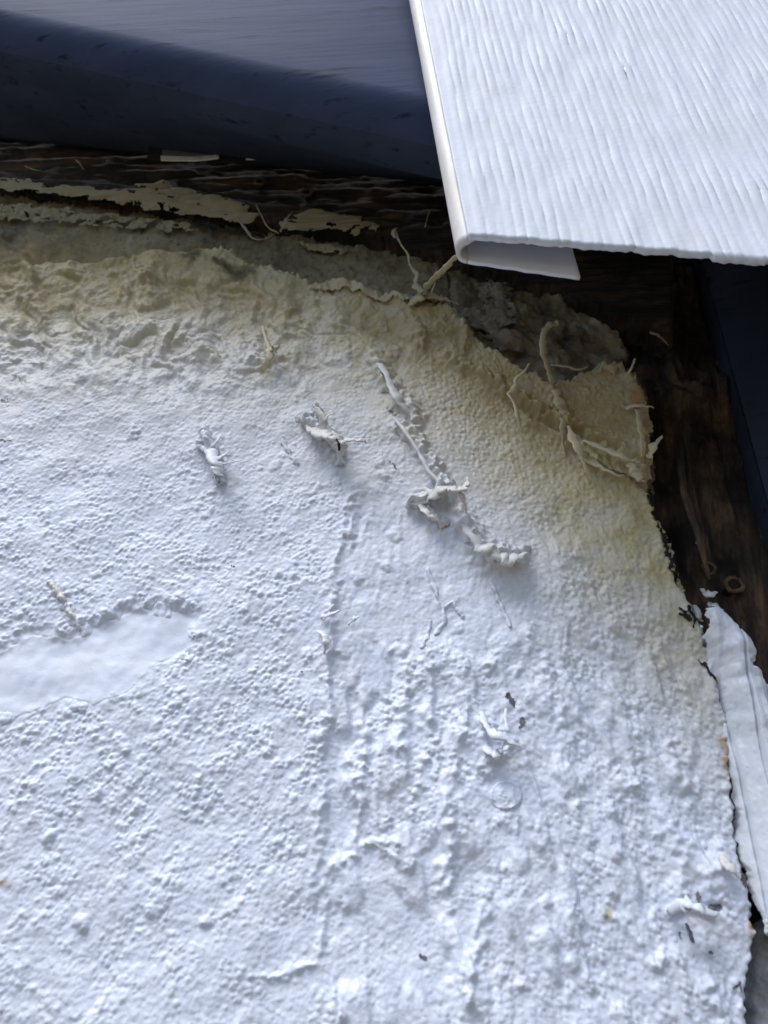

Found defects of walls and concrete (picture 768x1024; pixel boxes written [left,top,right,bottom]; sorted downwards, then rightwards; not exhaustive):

damp [212,257,251,289]
spalling [0,177,656,495]
peeling [405,474,470,529]